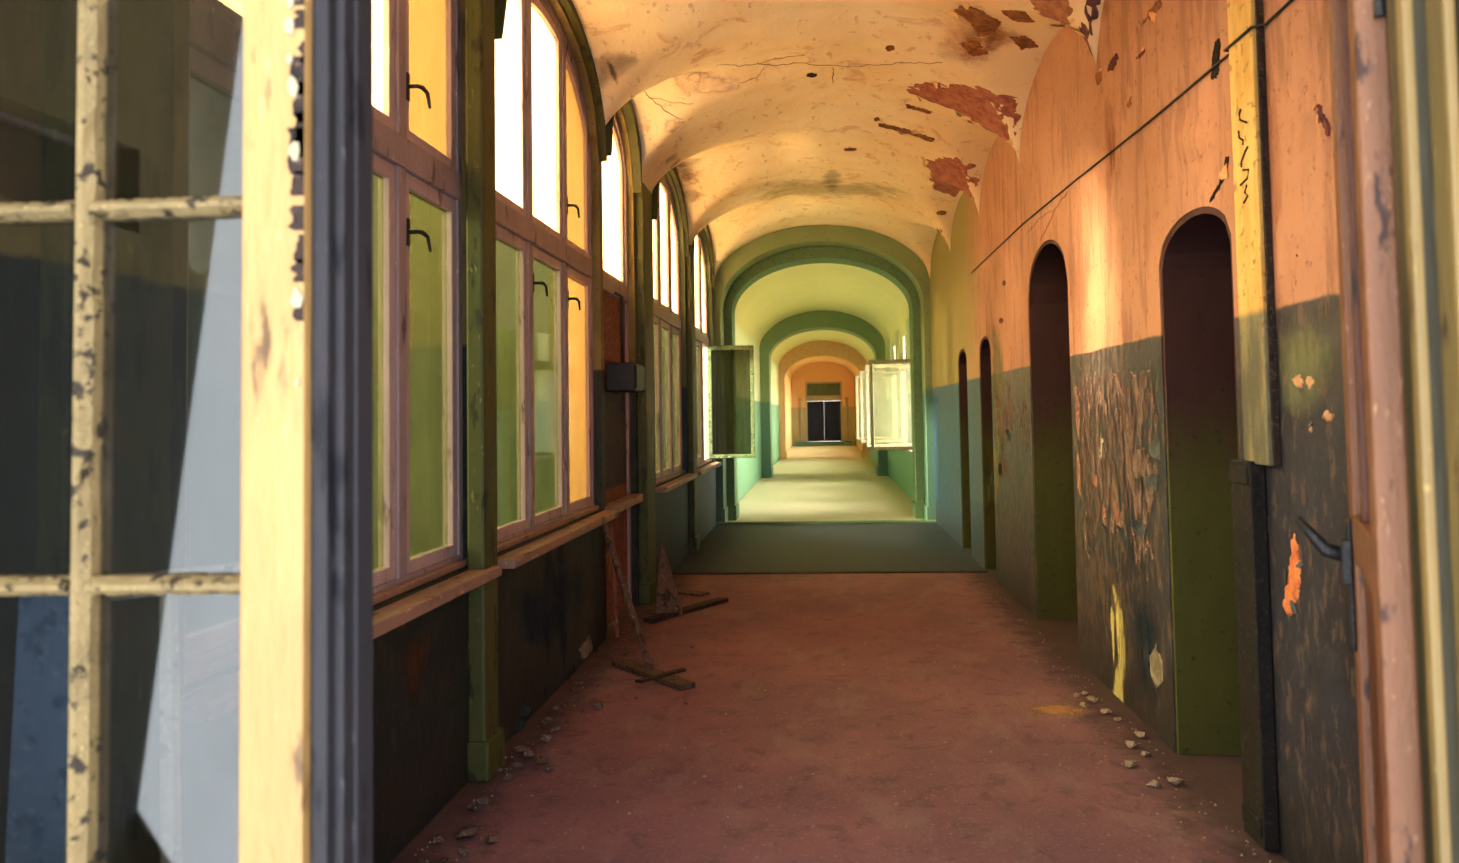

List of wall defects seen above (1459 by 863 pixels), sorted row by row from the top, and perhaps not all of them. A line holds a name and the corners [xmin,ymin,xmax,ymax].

peeling [948,0,1145,85]
peeling [1139,0,1162,28]
spalling [1211,38,1221,80]
spalling [905,81,1021,145]
spalling [874,117,981,234]